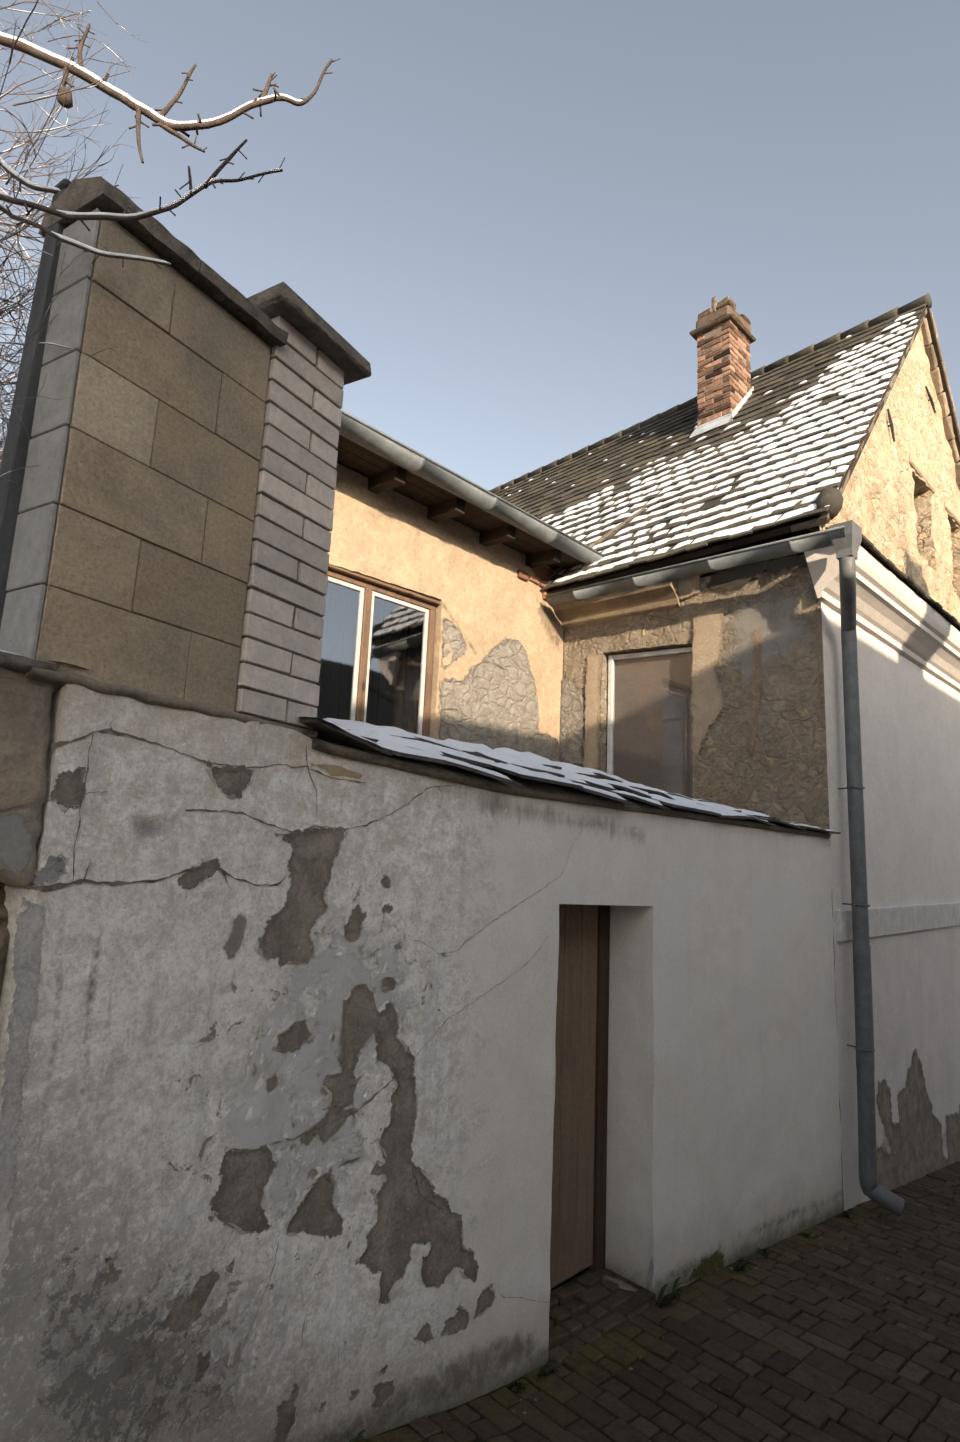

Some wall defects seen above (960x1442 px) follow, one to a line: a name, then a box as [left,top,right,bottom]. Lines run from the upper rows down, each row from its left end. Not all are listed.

spalling [437,617,584,765]
peeling [49,766,86,813]
crack [0,718,452,892]
crack [358,821,590,963]
peeling [0,854,67,1317]
peeling [135,824,496,1442]
crack [337,1157,361,1168]
crack [271,936,549,1145]
peeling [876,1049,960,1191]
peeling [105,1256,122,1285]